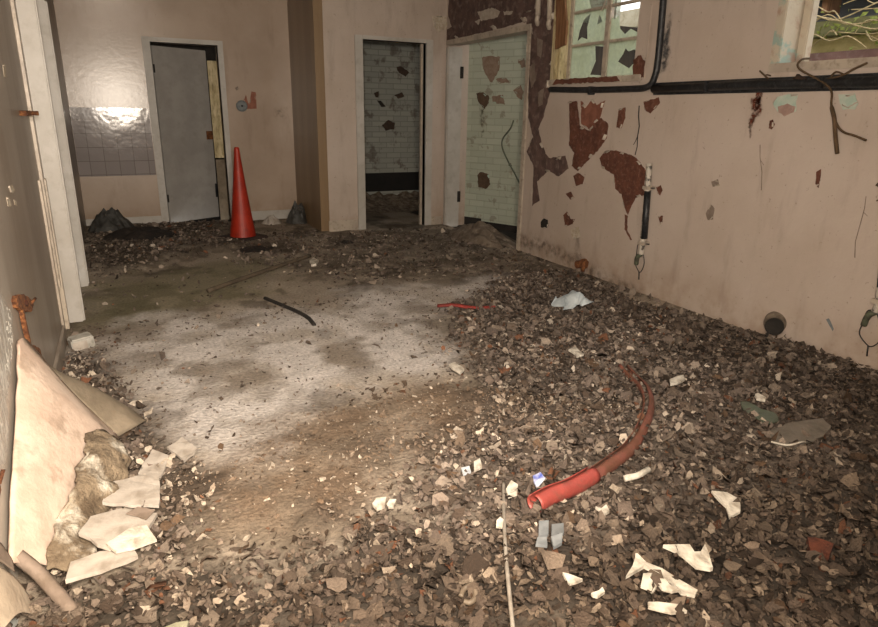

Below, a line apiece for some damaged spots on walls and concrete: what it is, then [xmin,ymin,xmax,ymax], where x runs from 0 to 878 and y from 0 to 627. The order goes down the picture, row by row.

flaking render [432,0,646,240]
flaking render [644,97,660,113]